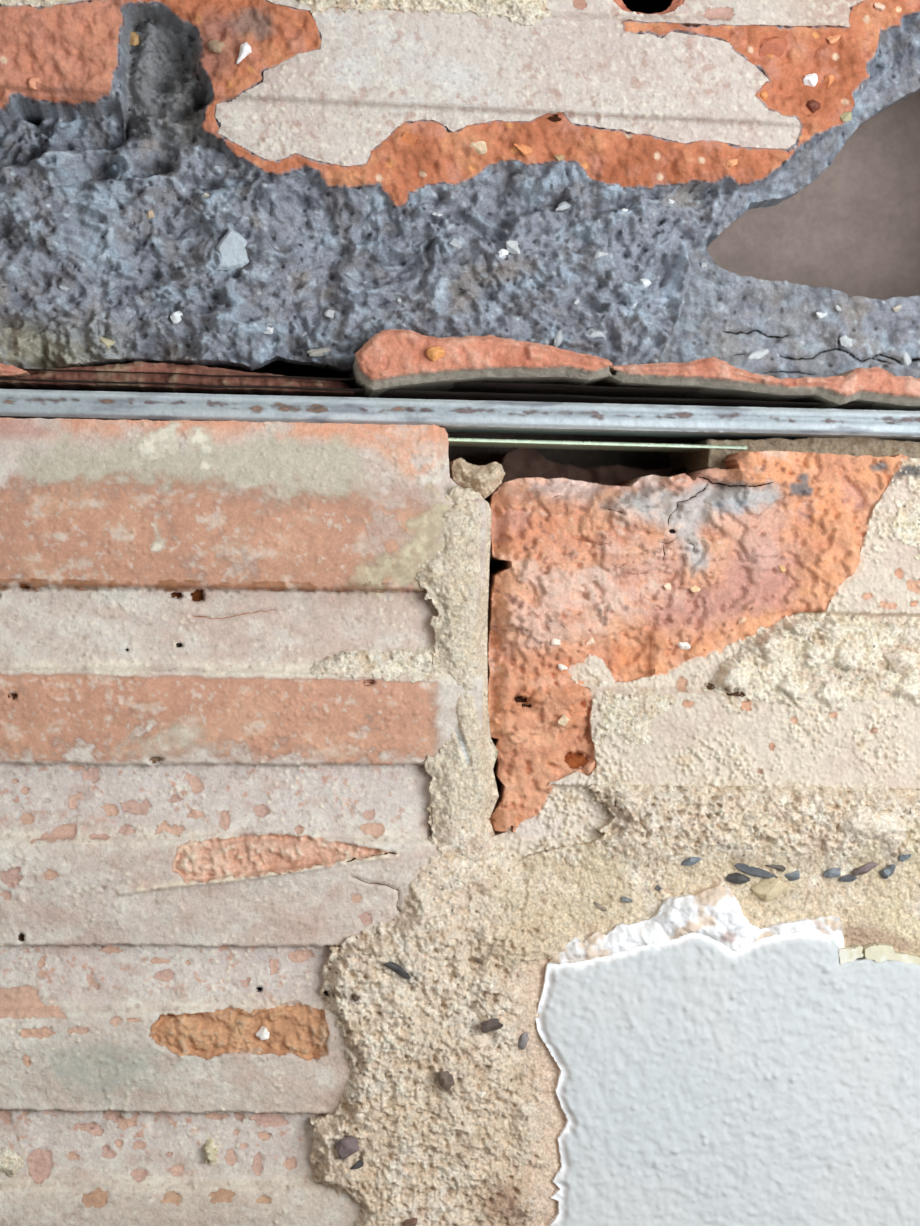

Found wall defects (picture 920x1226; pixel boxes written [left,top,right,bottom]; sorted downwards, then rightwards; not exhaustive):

spalling [0,0,920,411]
crack [723,329,920,375]
peeling [862,567,920,609]
spalling [485,448,908,833]
peeling [0,674,437,844]
spalling [154,772,389,883]
peeling [0,866,24,900]
peeling [352,894,373,926]
spalling [549,863,920,965]
peeling [150,957,191,982]
peeling [0,984,89,1039]
spalling [110,991,329,1061]